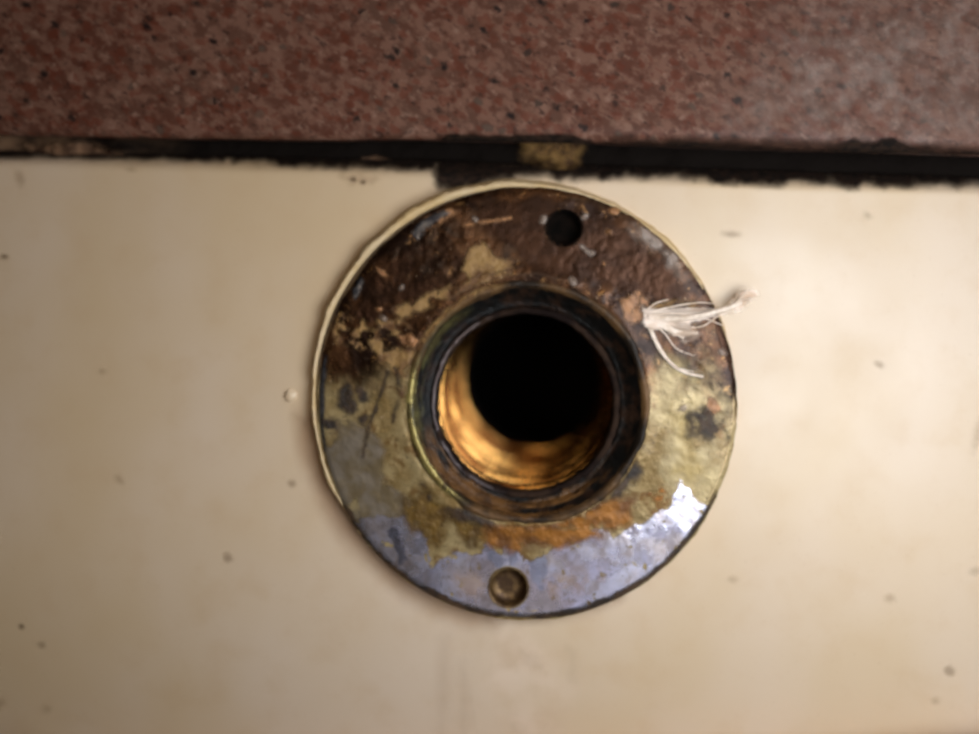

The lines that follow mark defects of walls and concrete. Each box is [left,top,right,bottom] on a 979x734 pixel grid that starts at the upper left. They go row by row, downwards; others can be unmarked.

corrosion [709,304,736,397]
corrosion [404,436,666,552]
corrosion [343,504,501,617]
corrosion [533,496,715,619]